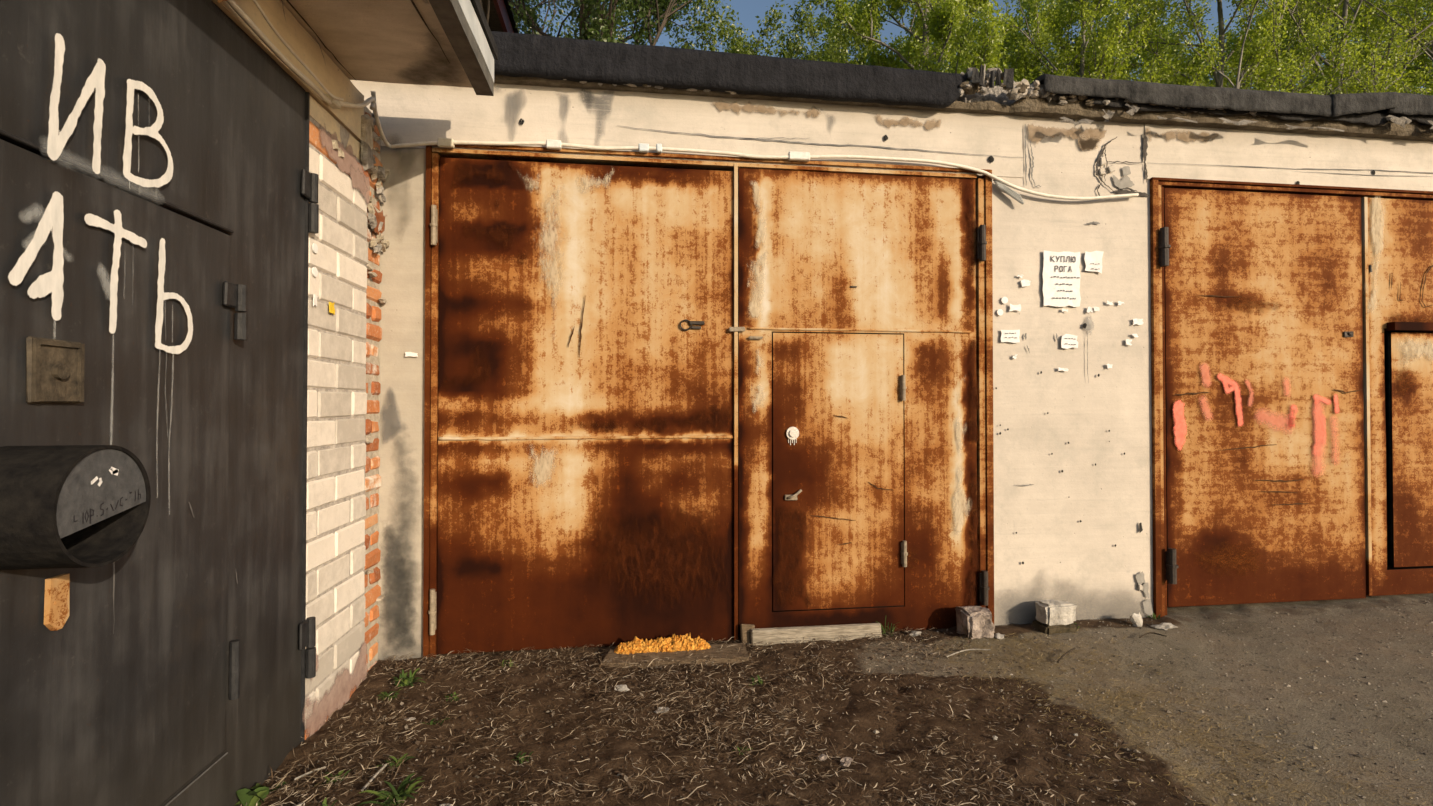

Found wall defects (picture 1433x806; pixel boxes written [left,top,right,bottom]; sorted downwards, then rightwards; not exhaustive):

leakage [508,94,521,121]
leakage [561,89,613,122]
spalling [320,113,390,278]
leakage [383,391,401,440]
corrosion [967,341,979,442]
leakage [386,505,414,649]
corrosion [966,472,980,606]